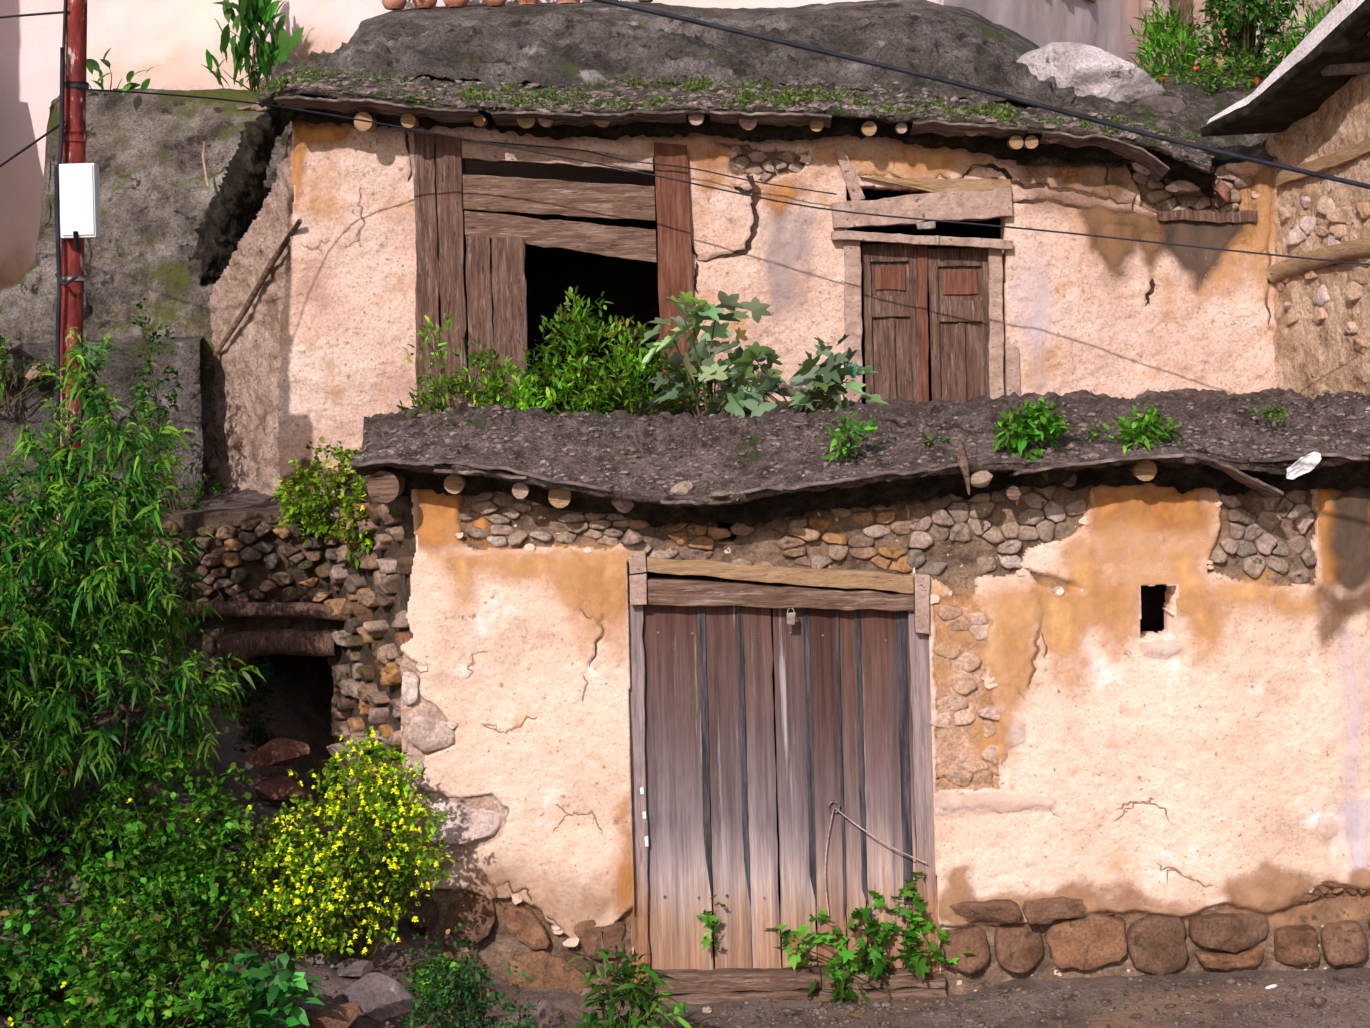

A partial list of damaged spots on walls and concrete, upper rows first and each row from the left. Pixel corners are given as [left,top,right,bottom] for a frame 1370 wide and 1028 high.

crack [691,172,761,294]
spalling [720,143,812,183]
leakage [1025,158,1275,289]
spalling [1126,164,1260,213]
leakage [1034,483,1370,657]
spalling [1206,489,1317,586]
crack [579,608,605,702]
spalling [455,485,1093,794]
spalling [399,651,634,997]
crack [1113,797,1173,826]